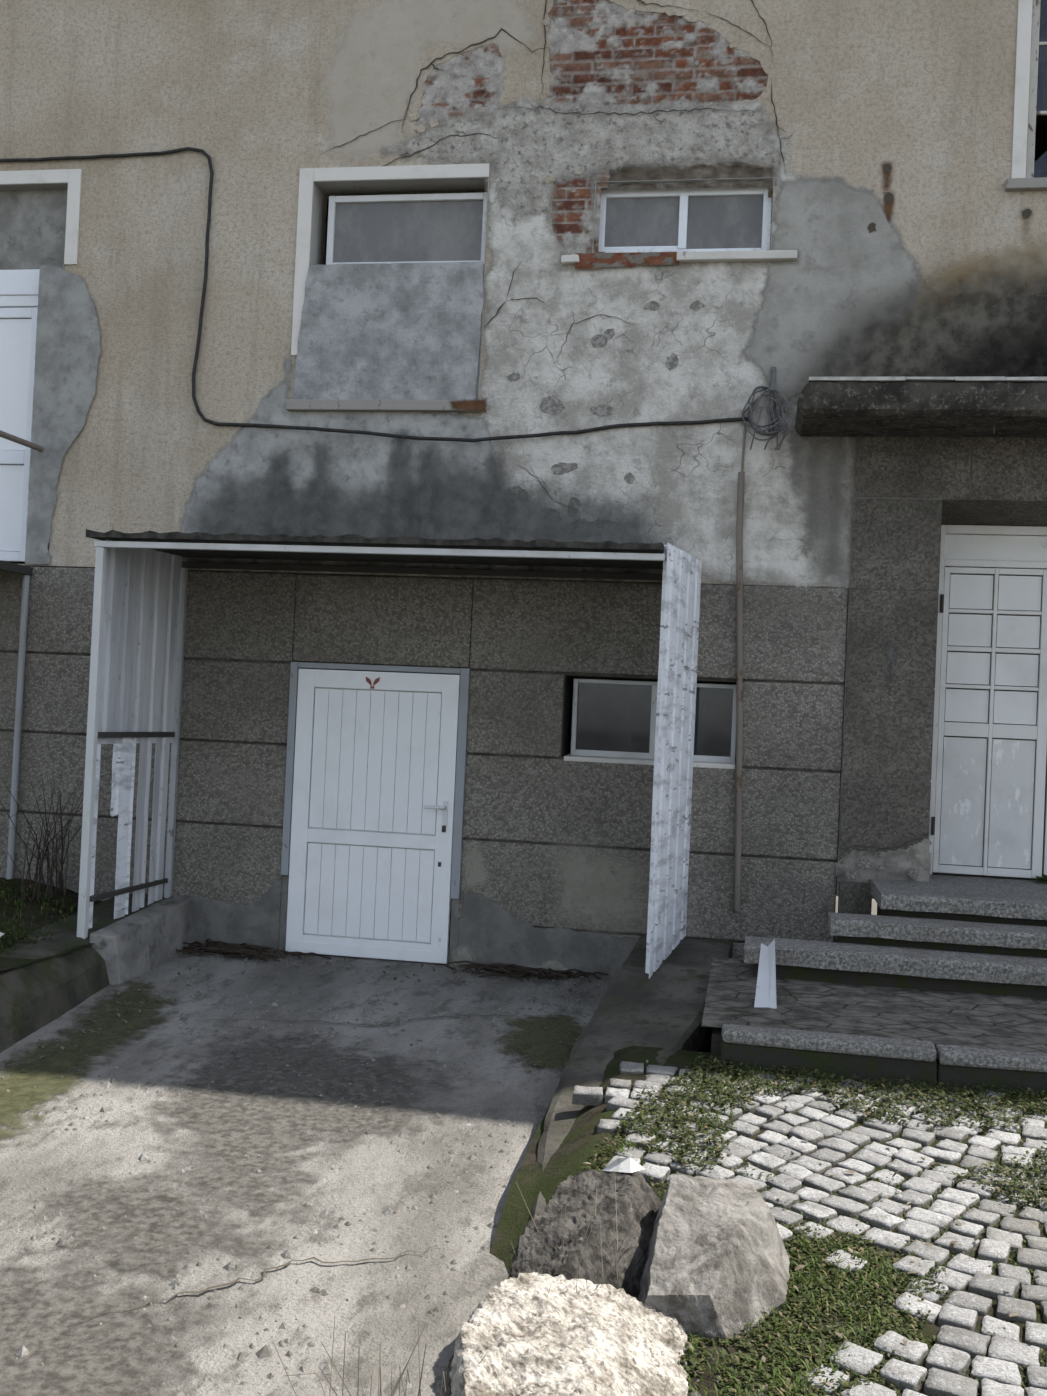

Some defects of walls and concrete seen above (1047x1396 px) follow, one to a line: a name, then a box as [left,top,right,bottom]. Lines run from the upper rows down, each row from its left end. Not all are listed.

crack [321,0,793,173]
rust [867,163,894,233]
peeling [330,0,863,588]
leakage [786,247,1047,408]
leakage [200,438,661,544]